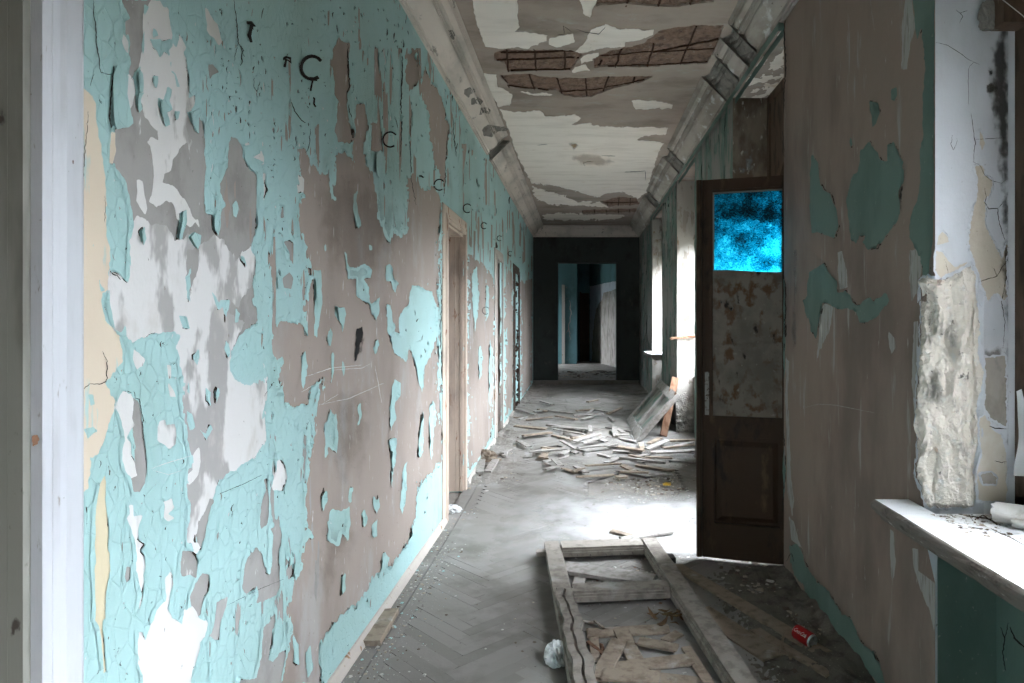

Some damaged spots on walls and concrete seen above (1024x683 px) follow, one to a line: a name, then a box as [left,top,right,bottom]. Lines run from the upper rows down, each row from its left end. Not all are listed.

crack [84,353,144,437]
peeling [84,0,533,683]
peeling [473,0,724,221]
peeling [744,31,784,98]
flaking render [803,0,1024,529]
crack [936,42,1007,339]
damp [987,31,1008,180]
peeling [789,544,885,683]